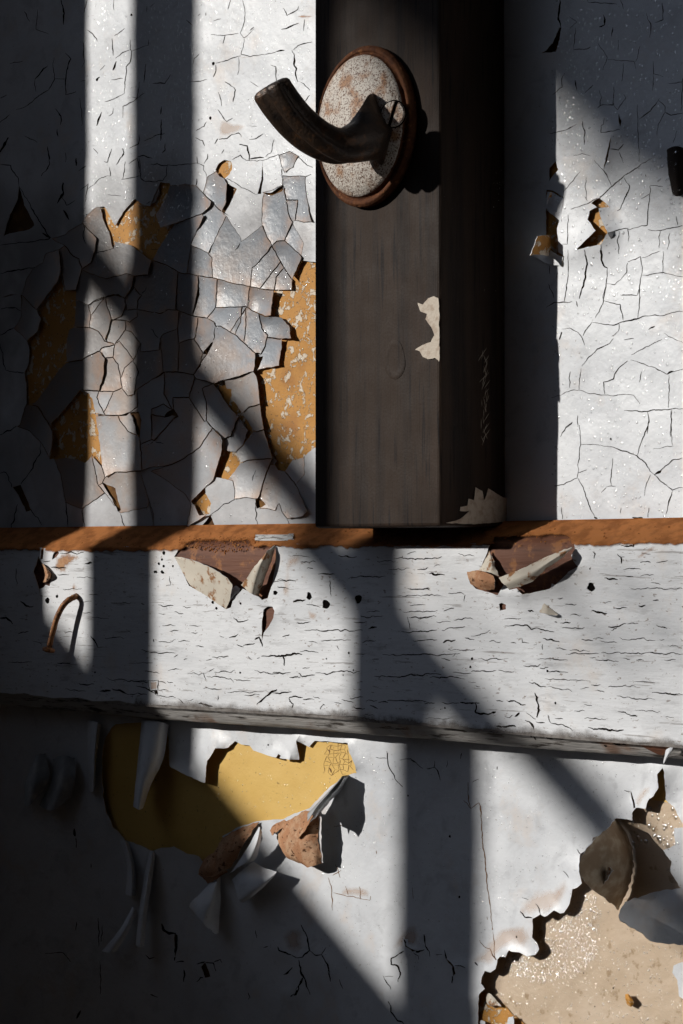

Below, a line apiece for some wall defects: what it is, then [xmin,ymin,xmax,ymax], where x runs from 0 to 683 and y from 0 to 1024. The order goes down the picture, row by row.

crack [0,0,311,274]
peeling [2,151,316,526]
peeling [530,162,564,266]
peeling [578,198,609,249]
crack [546,0,683,519]
peeling [154,545,275,610]
corrosion [0,517,683,570]
crack [43,544,683,747]
crack [146,924,222,982]
peeling [24,721,356,953]
crack [255,925,343,997]
peeling [478,745,683,1024]